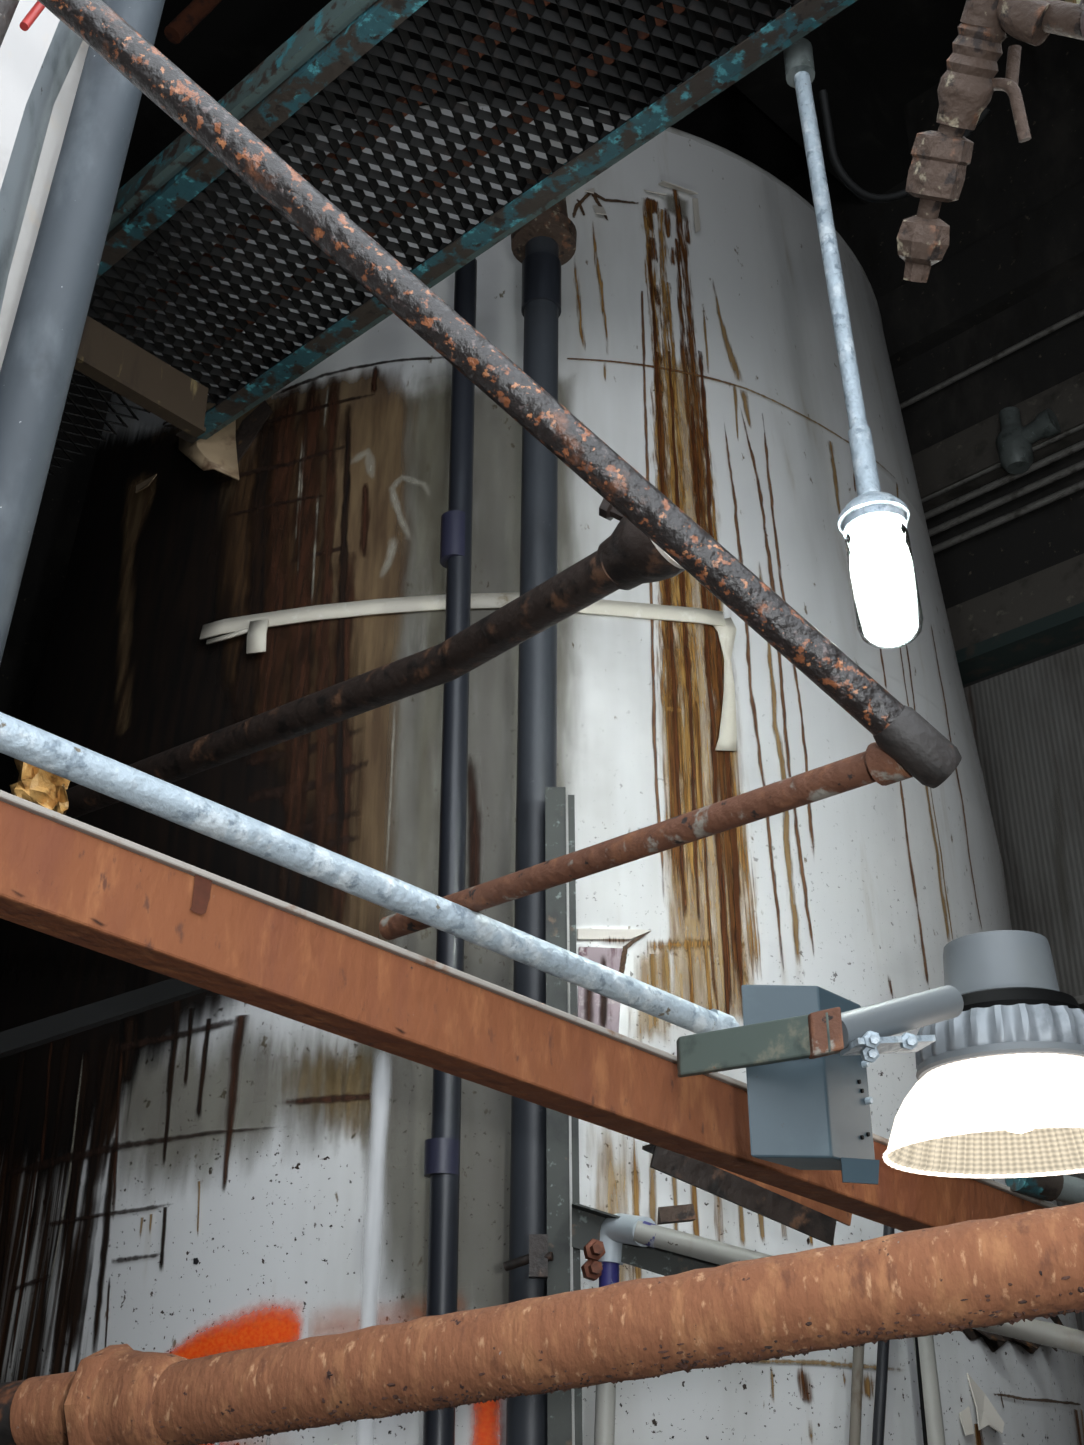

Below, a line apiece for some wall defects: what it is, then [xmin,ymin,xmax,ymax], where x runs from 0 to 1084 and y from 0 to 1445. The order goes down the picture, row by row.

corrosion [567,189,856,601]
damp [216,357,452,723]
damp [387,684,444,896]
damp [465,645,519,889]
corrosion [639,1012,670,1037]
corrosion [649,570,740,823]
corrosion [641,826,760,1016]
corrosion [745,623,808,786]
corrosion [766,804,814,968]
damp [0,1001,266,1361]
damp [362,1044,433,1318]
damp [457,1078,512,1312]